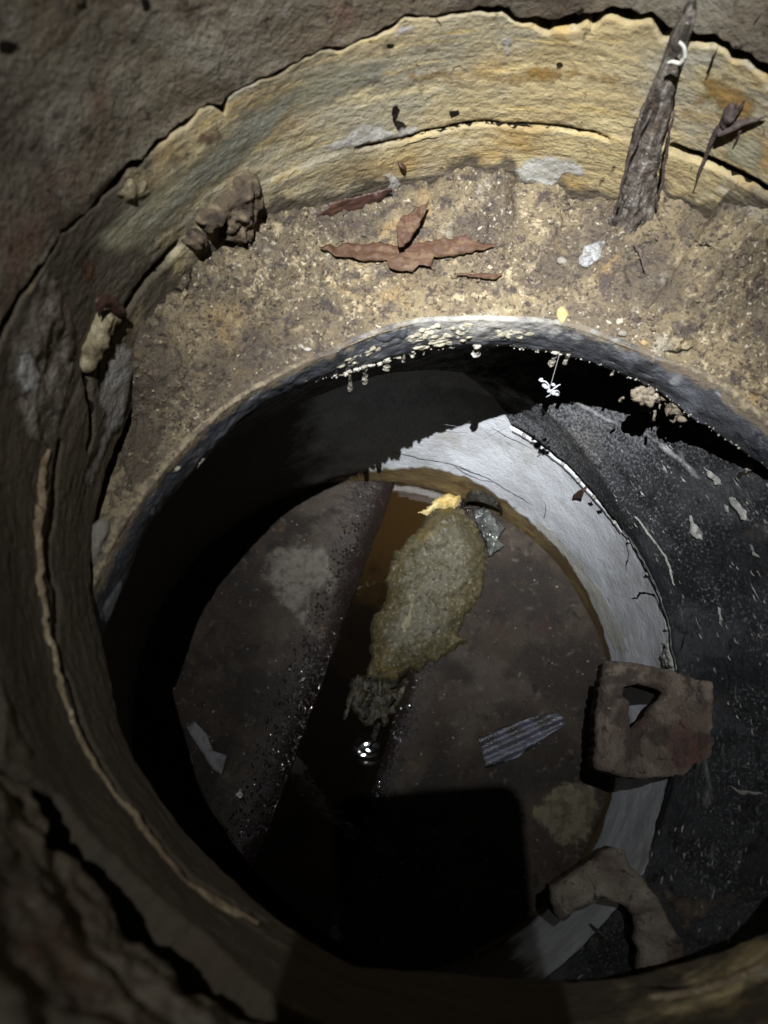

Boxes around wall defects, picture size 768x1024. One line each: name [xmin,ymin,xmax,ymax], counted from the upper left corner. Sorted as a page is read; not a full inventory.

crack [359,120,607,148]
crack [676,144,768,190]
leakage [331,356,401,378]